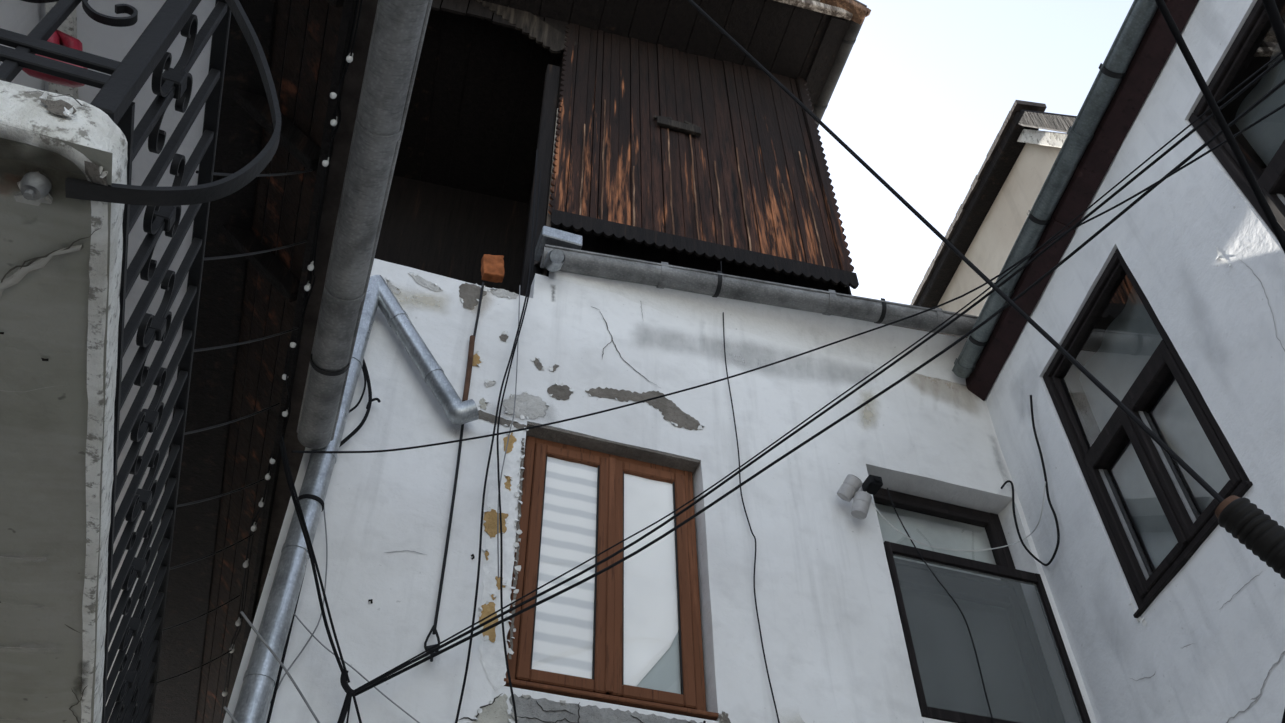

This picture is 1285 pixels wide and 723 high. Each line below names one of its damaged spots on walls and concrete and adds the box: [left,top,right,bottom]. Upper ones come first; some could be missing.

peeling [39,91,77,117]
crack [1,228,100,283]
flaking render [408,272,443,292]
flaking render [459,282,519,309]
crack [593,307,660,388]
peeling [471,351,705,723]
flaking render [718,711,731,723]